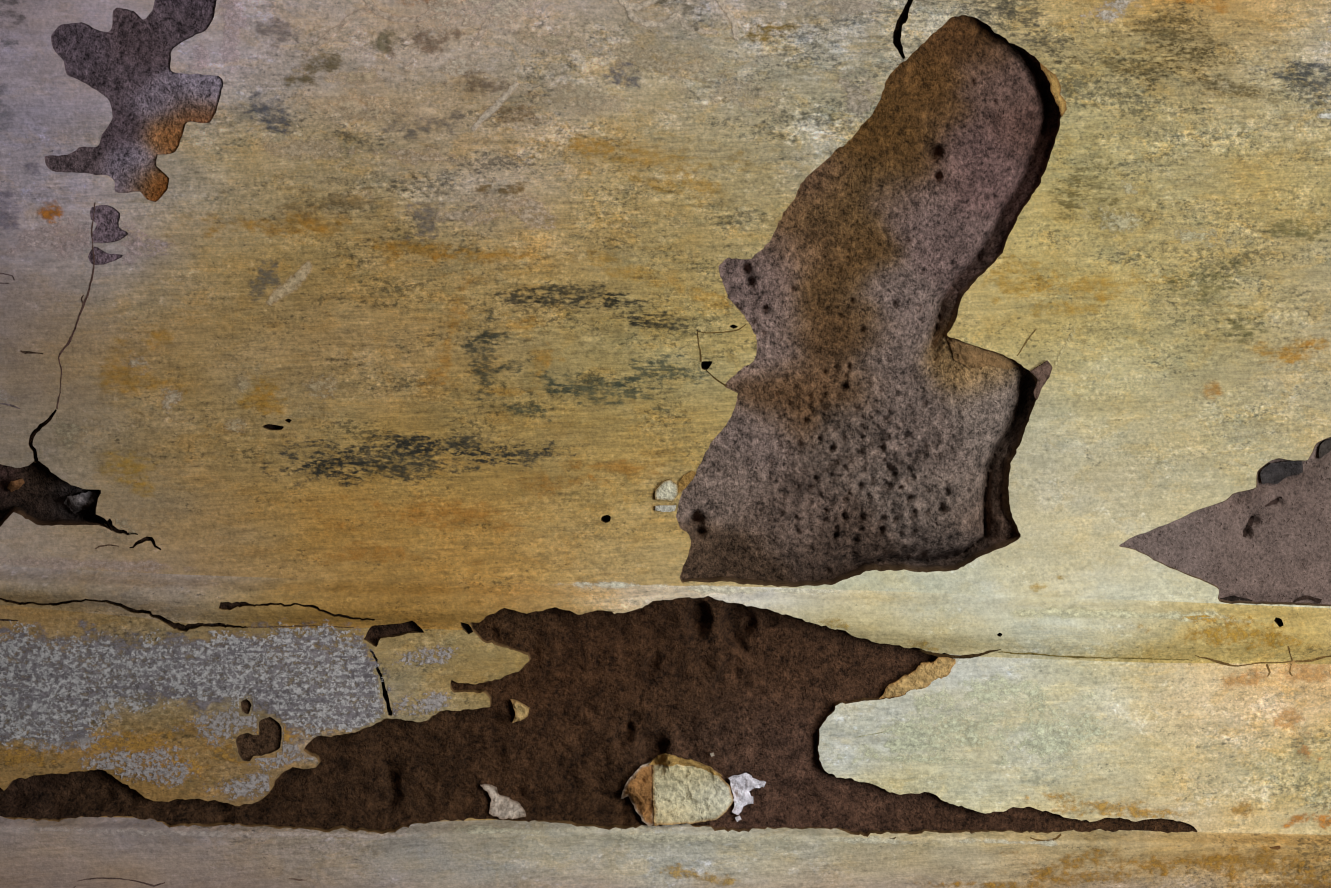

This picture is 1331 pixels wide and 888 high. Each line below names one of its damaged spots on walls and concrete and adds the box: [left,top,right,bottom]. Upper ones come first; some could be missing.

crack [893,0,913,59]
peeling [45,0,223,265]
flaking render [0,460,112,531]
crack [28,203,95,463]
crack [95,519,161,550]
spalling [263,419,292,430]
flaking render [655,15,1067,587]
flaking render [1119,437,1331,627]
crack [0,598,392,716]
flaking render [0,596,1197,837]